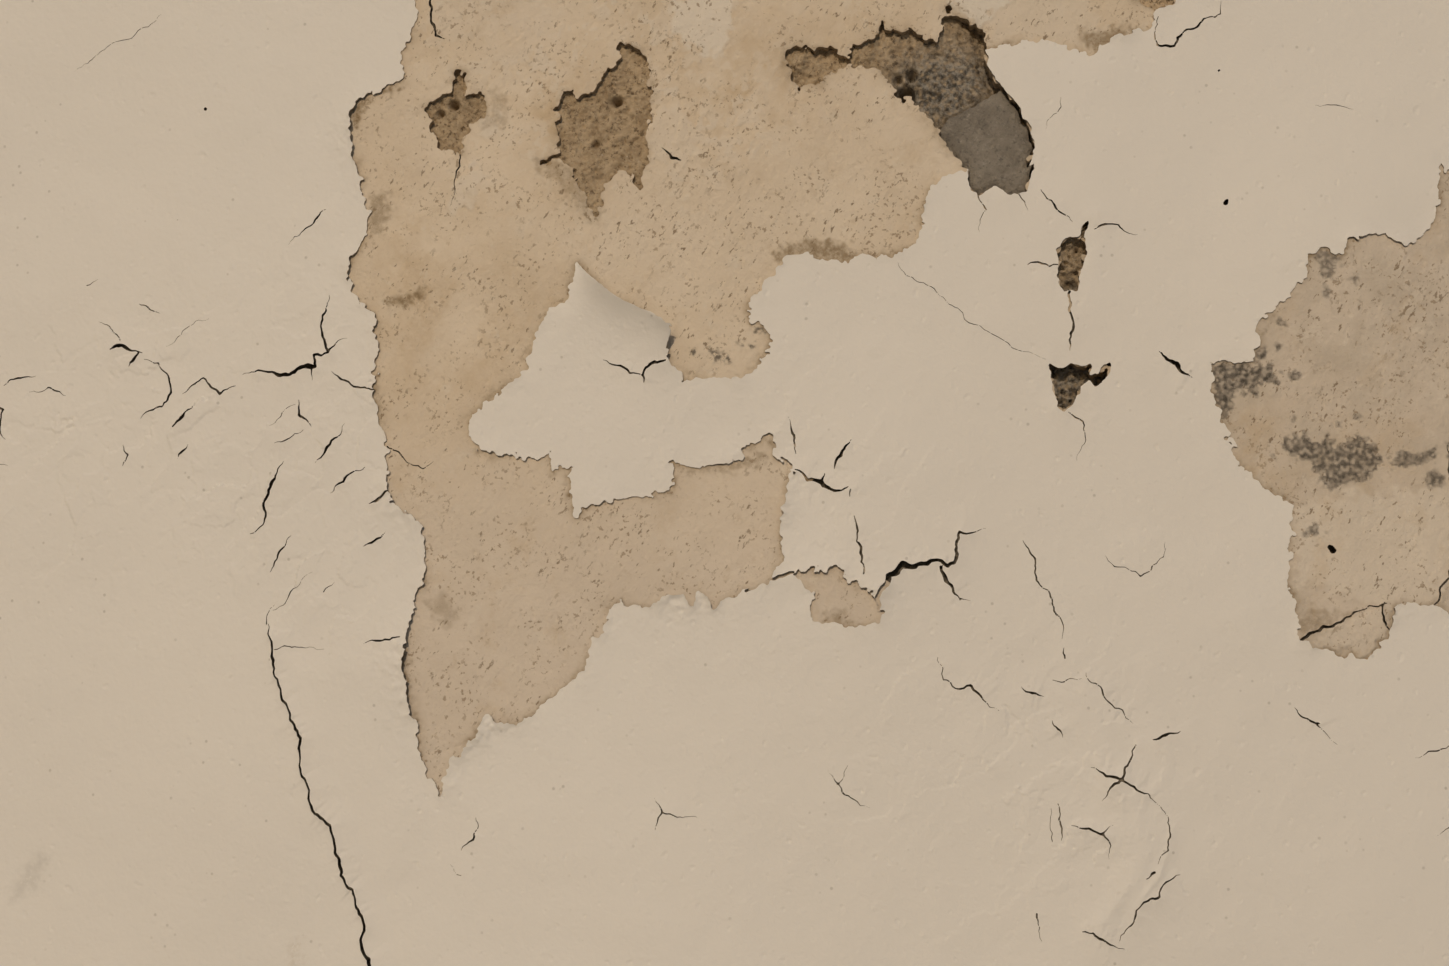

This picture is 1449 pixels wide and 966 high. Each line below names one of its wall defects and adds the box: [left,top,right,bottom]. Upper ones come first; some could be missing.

crack [0,376,66,466]
crack [101,296,434,966]
peeling [347,0,1176,796]
crack [789,419,986,601]
peeling [1210,165,1449,659]
crack [1300,602,1390,641]
crack [1434,570,1449,605]
crack [832,765,870,808]
crack [937,541,1180,949]